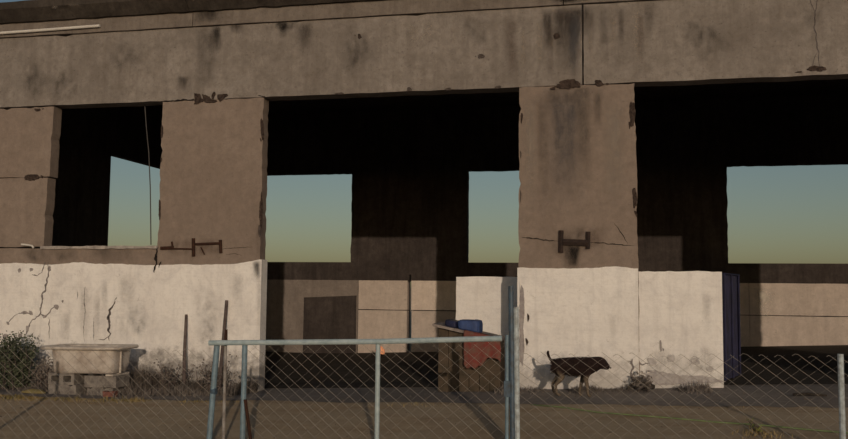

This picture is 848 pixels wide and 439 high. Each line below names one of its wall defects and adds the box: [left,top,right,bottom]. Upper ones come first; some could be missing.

spalling [550,79,580,90]
spalling [194,92,228,104]
crack [590,223,634,246]
crack [9,262,54,337]
crack [77,289,117,340]